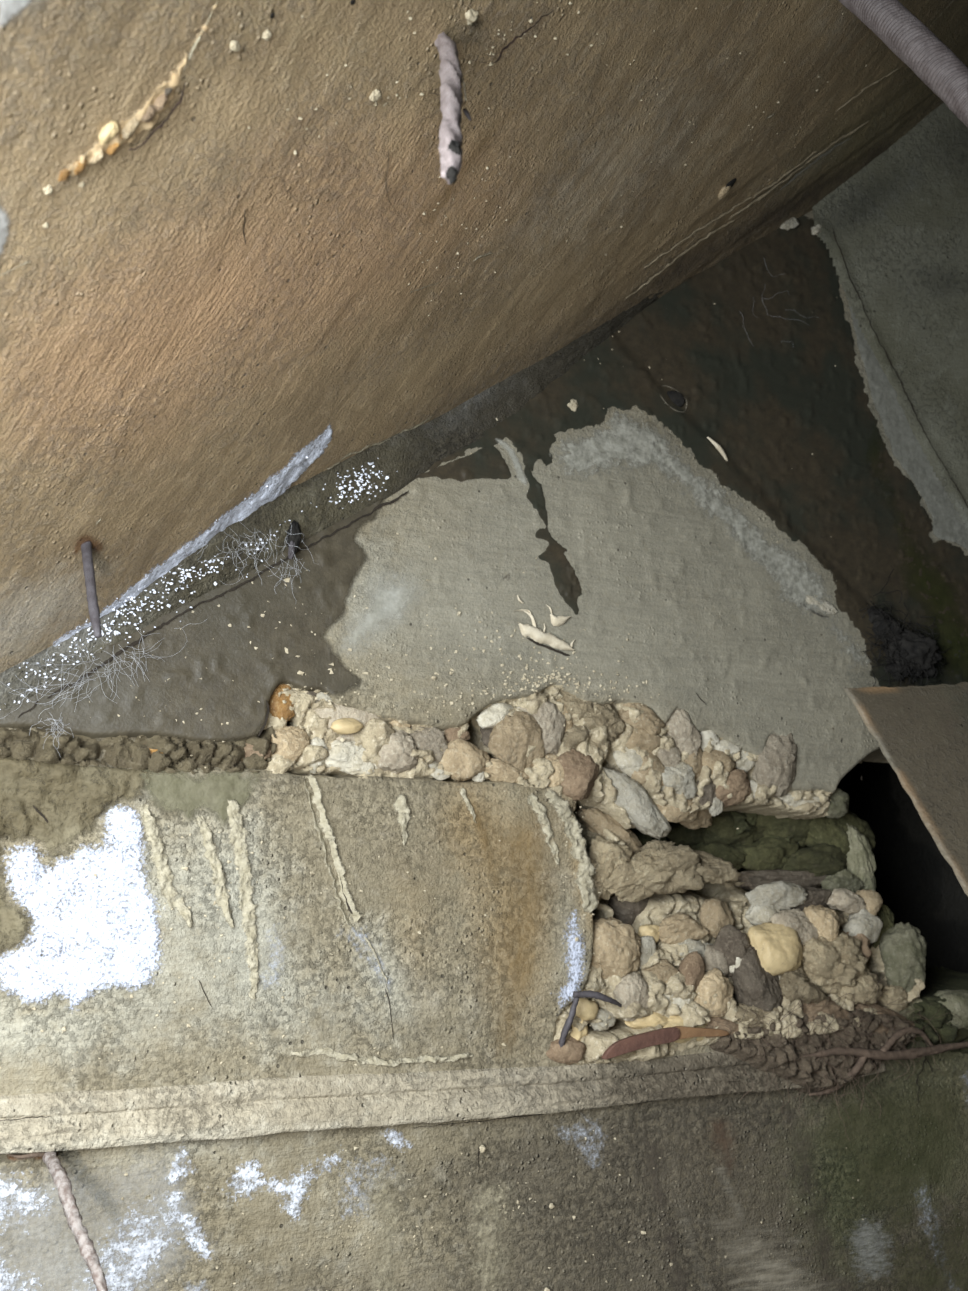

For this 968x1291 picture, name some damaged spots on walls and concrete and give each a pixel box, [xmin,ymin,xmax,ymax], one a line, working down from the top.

spalling [58,2,219,182]
leakage [53,425,333,646]
leakage [350,587,409,642]
peeling [514,595,575,656]
leakage [0,499,383,1010]
leakage [0,1150,211,1291]